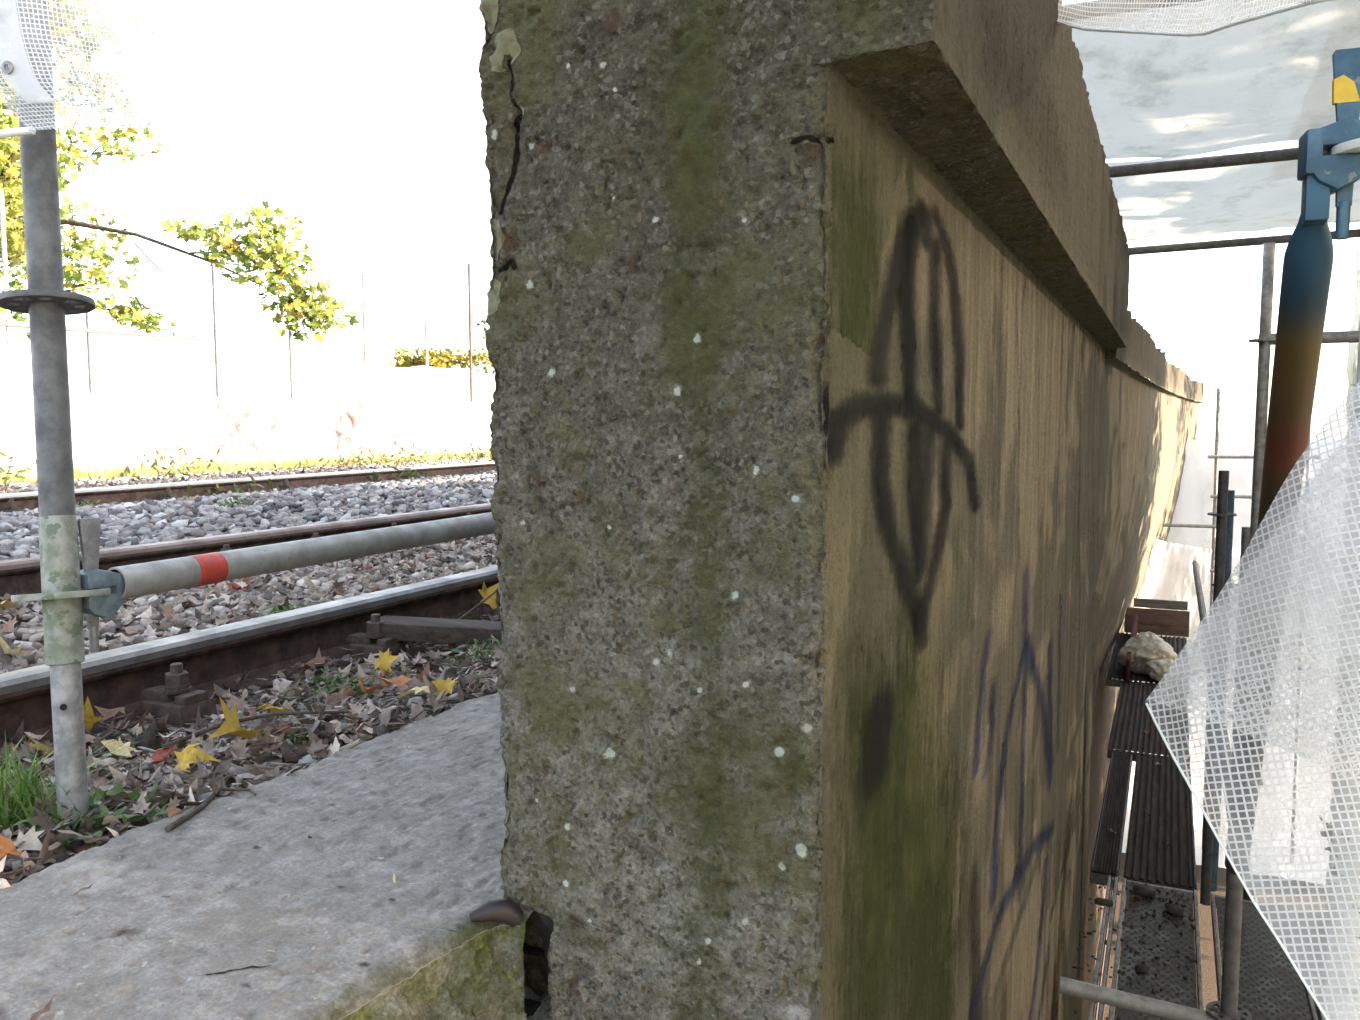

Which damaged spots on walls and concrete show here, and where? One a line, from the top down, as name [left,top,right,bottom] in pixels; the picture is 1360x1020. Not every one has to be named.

crack [499,59,523,214]
crack [498,259,517,273]